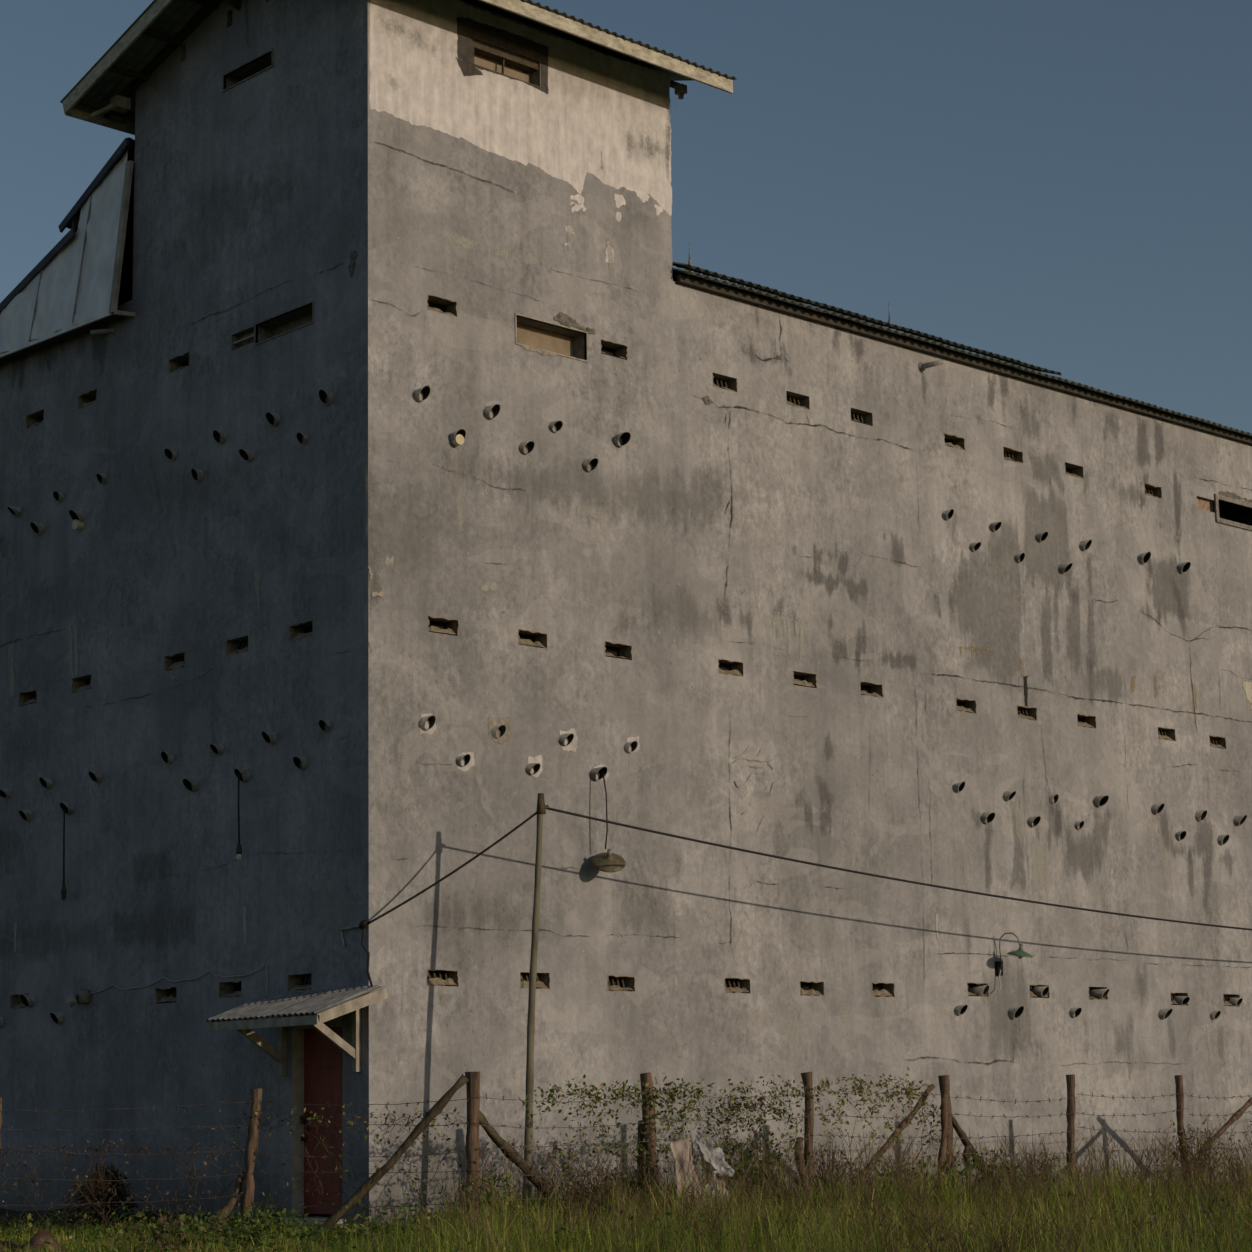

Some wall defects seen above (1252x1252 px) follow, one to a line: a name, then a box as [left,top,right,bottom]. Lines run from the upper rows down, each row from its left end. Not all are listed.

peeling [369,0,672,246]
crack [723,406,843,433]
water stain [1138,422,1163,483]
water stain [808,546,867,597]